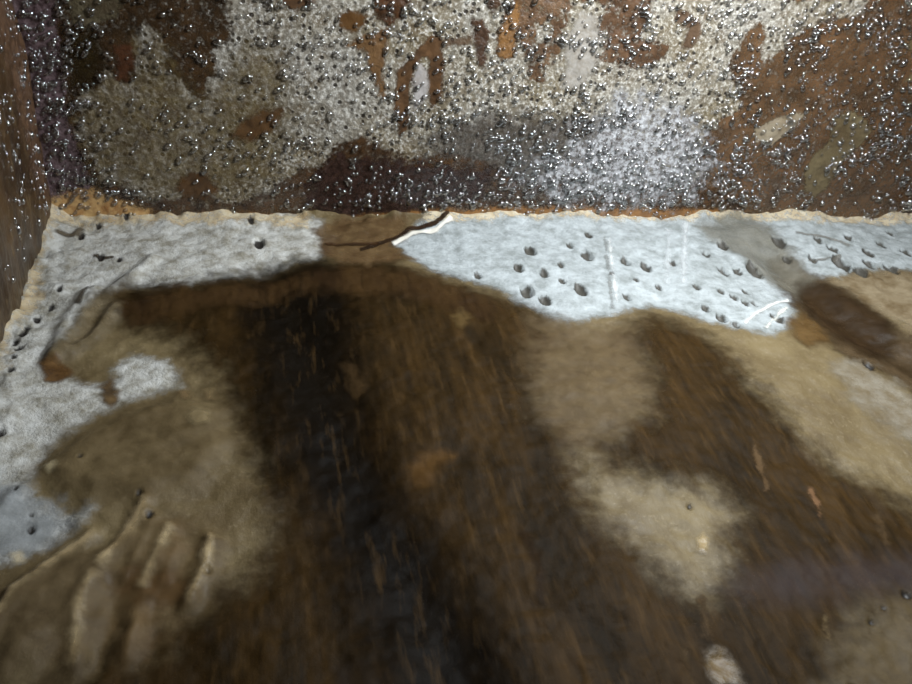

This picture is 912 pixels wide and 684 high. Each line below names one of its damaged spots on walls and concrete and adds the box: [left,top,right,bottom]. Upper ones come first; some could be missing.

corrosion [0,0,912,220]
damp [0,258,45,350]
crack [325,210,453,251]
damp [424,89,912,439]
damp [0,487,55,562]
damp [55,215,912,684]